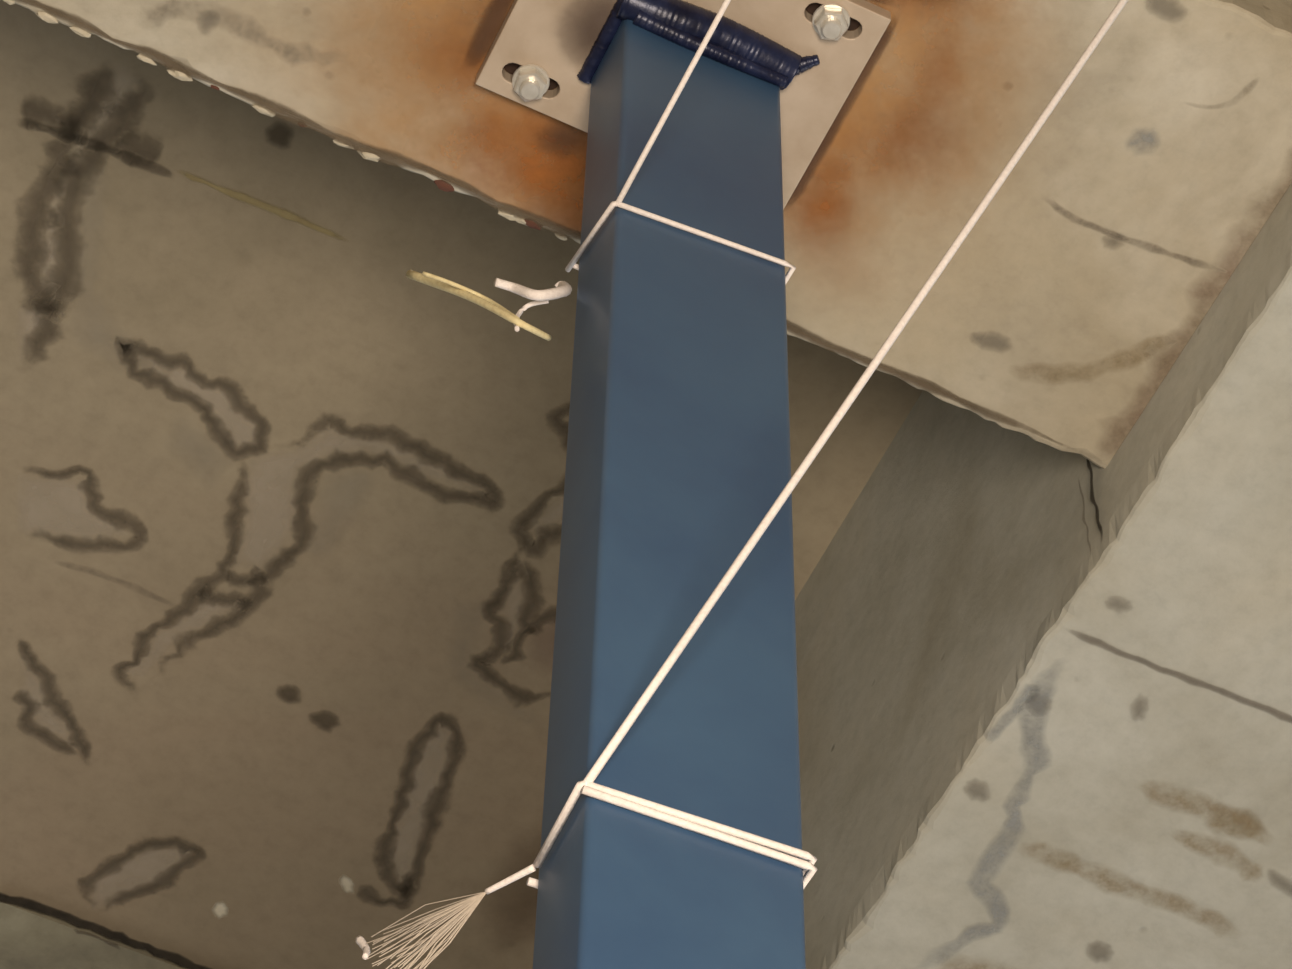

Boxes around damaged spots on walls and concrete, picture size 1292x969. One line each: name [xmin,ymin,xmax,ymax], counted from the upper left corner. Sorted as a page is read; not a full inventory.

water stain [20,75,159,352]
corrosion [396,0,588,228]
corrosion [791,0,991,221]
crack [1086,638,1292,721]